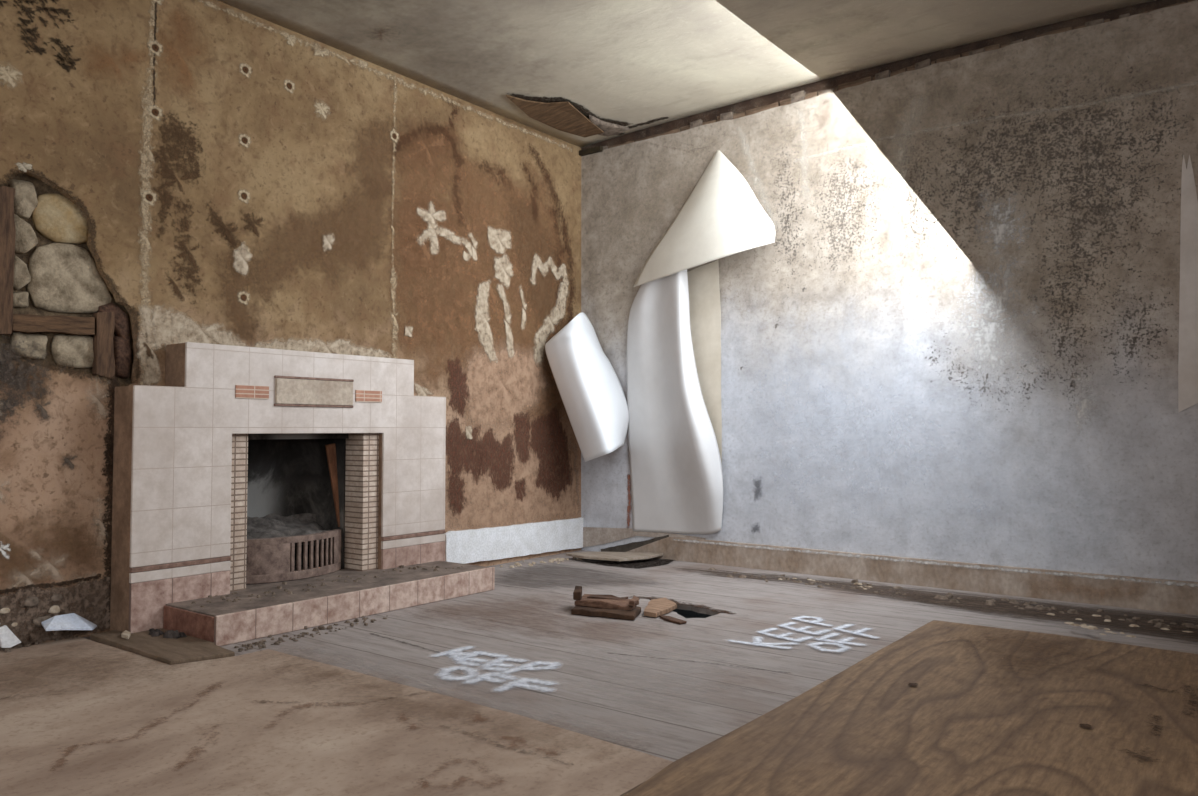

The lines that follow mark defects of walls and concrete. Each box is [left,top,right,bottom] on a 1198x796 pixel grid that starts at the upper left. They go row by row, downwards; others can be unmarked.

damp [153,112,205,304]
spalling [0,162,391,415]
peeling [199,1,572,152]
damp [207,97,579,529]
spalling [589,115,629,137]
damp [764,140,878,292]
damp [891,57,1194,410]
damp [681,568,1198,643]